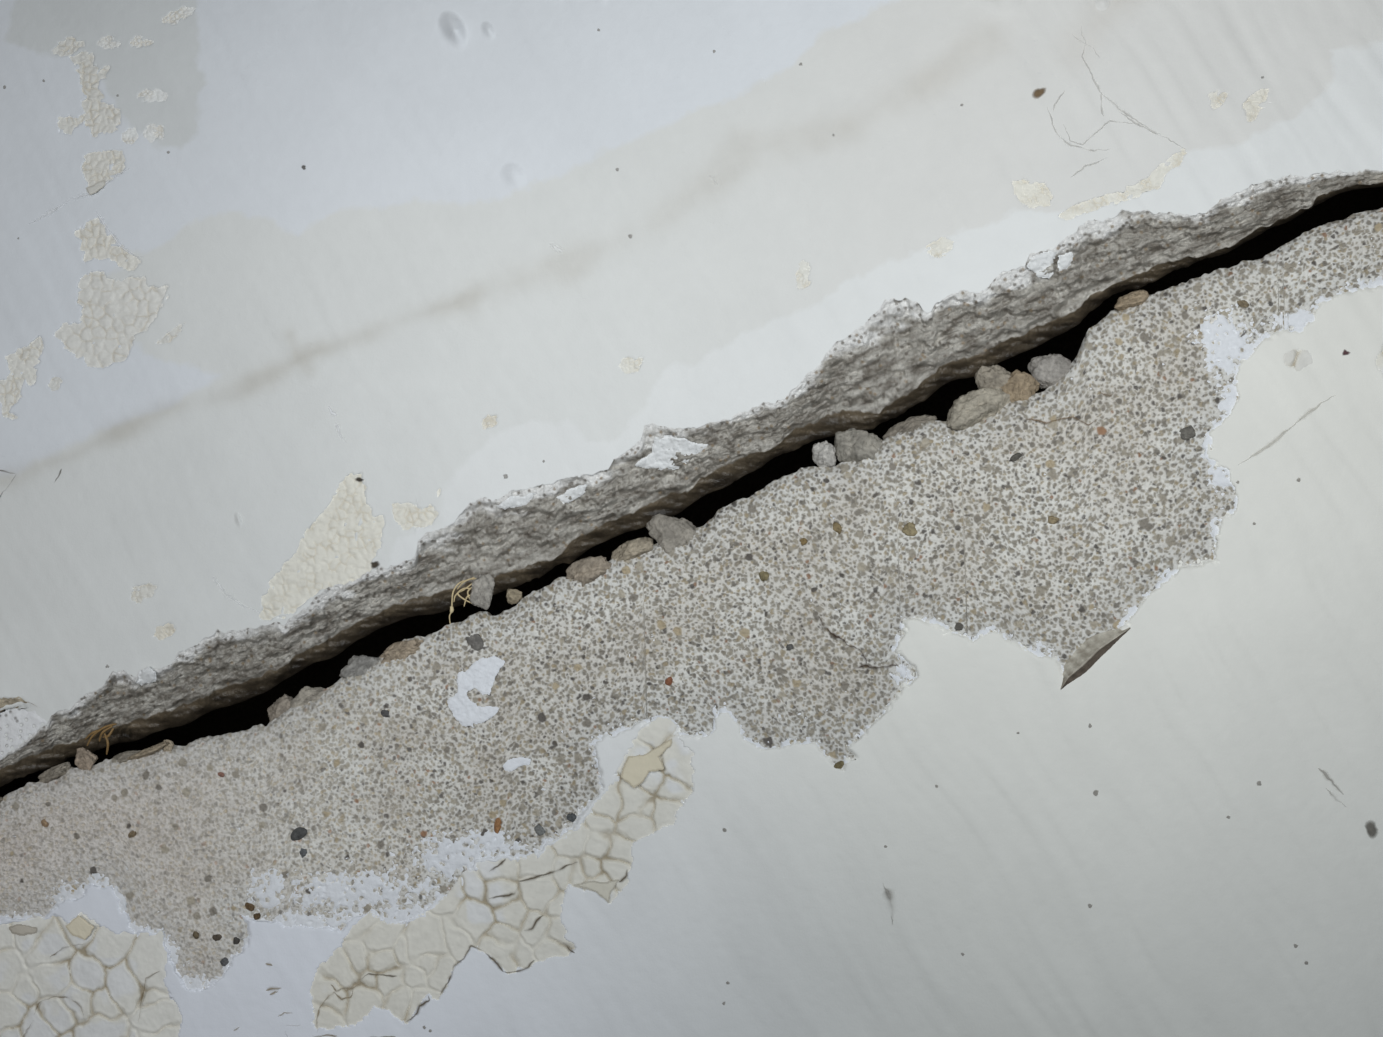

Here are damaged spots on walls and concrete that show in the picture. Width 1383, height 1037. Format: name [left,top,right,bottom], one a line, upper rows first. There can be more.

peeling [69,35,154,195]
crack [0,169,1383,797]
flaking render [0,208,1383,989]